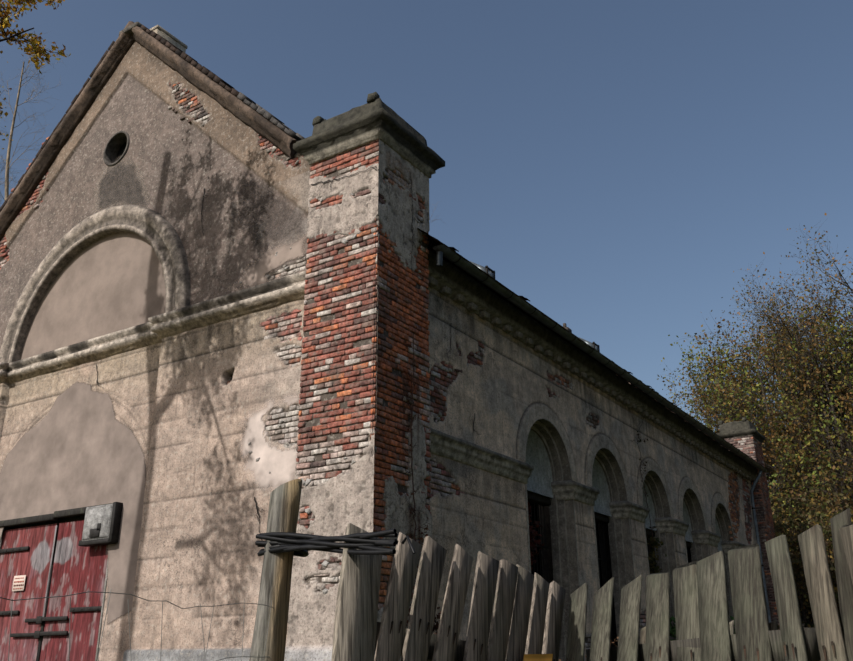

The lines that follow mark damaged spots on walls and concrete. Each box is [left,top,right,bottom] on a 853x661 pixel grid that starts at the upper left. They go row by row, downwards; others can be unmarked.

spalling [168,82,210,127]
spalling [13,171,49,222]
spalling [257,133,425,224]
spalling [0,233,11,269]
spalling [231,218,486,609]
spalling [728,472,752,545]